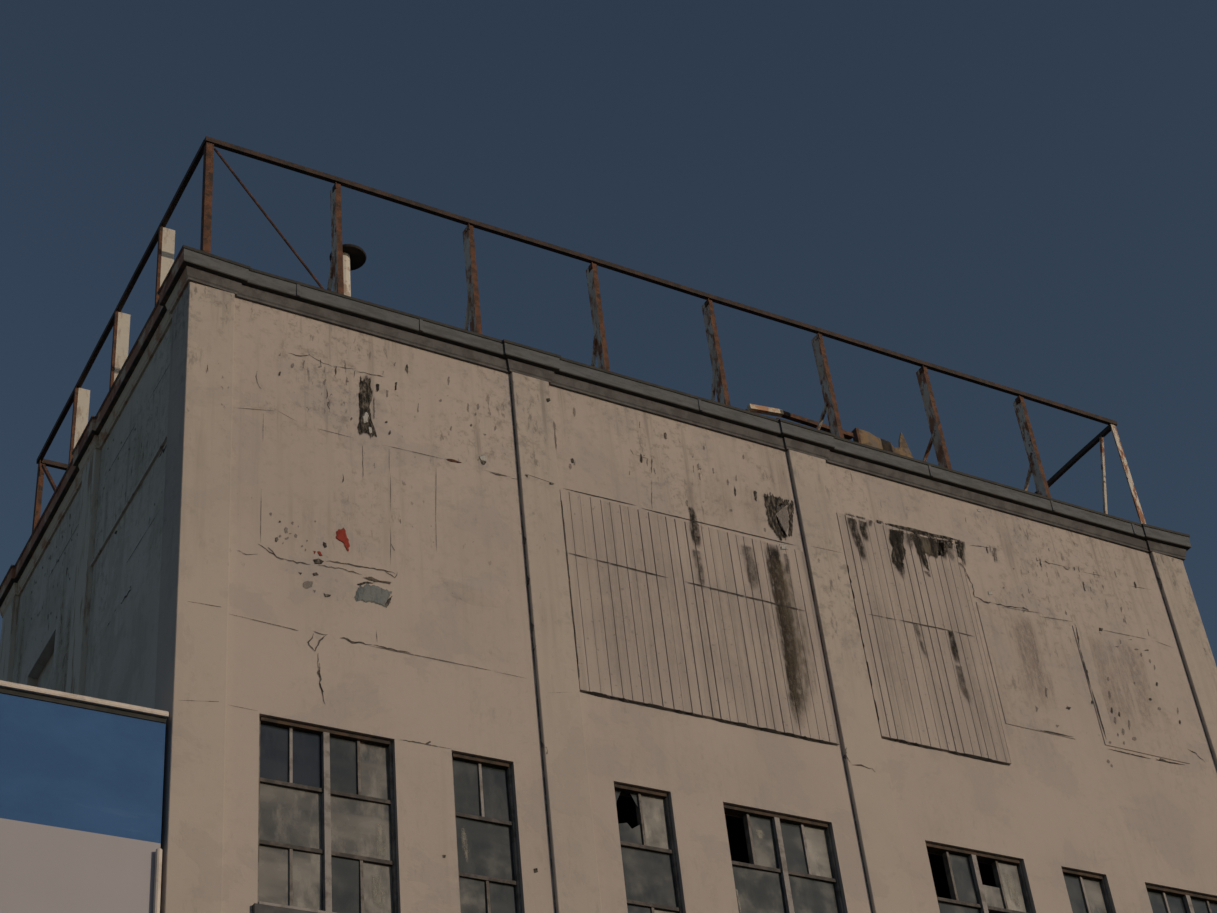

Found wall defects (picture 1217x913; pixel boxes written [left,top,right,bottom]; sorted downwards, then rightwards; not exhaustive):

spalling [350,376,391,438]
peeling [299,528,350,576]
damp [689,508,704,583]
spalling [754,491,794,549]
damp [846,514,969,578]
peeling [355,577,392,608]
damp [744,546,809,704]
crack [285,627,409,703]